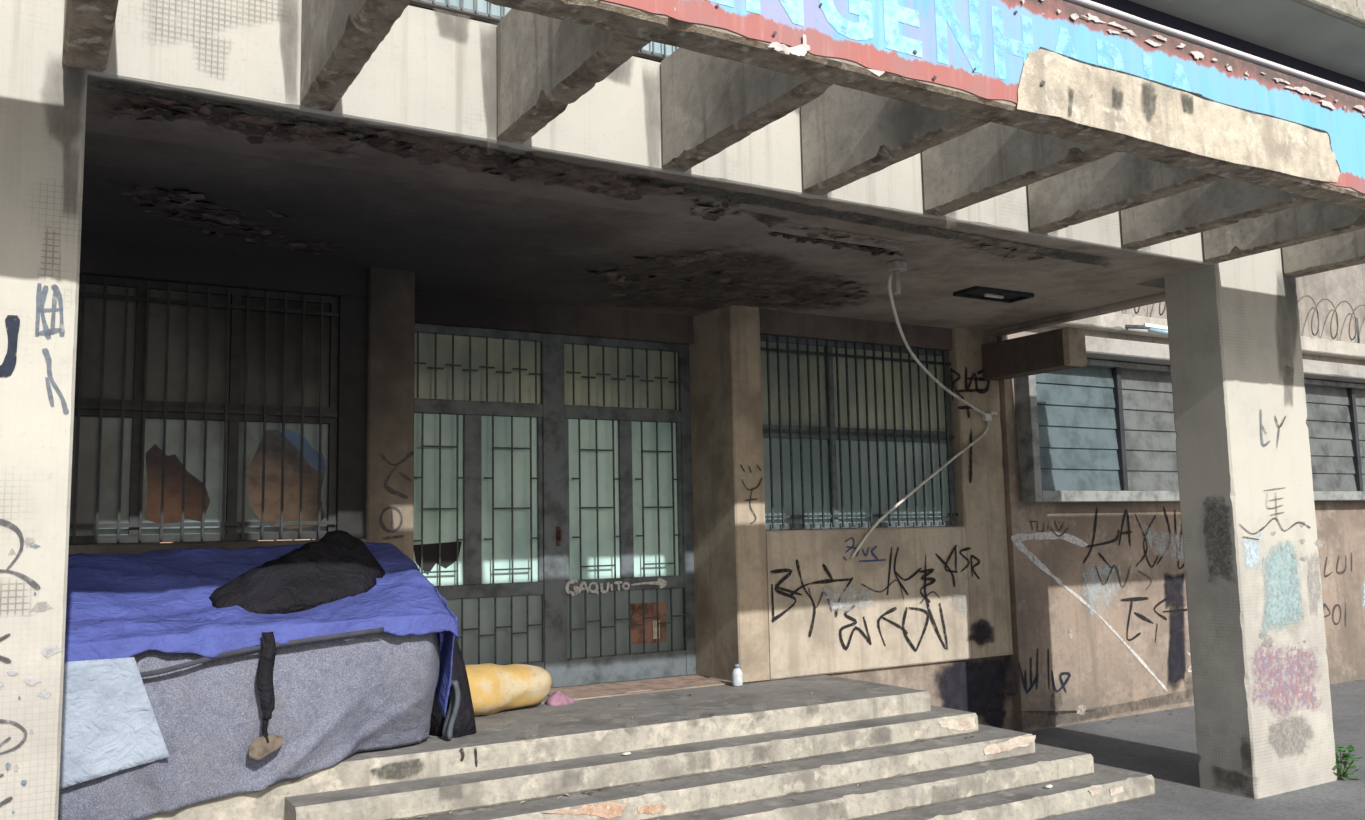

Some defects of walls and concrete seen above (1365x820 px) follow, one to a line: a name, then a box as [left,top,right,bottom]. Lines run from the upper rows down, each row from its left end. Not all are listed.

damp [54,68,430,211]
spalling [101,92,911,257]
damp [447,34,1107,267]
peeling [768,31,810,56]
flaking render [1017,49,1340,183]
peeling [1057,9,1365,116]
spalling [540,801,667,819]